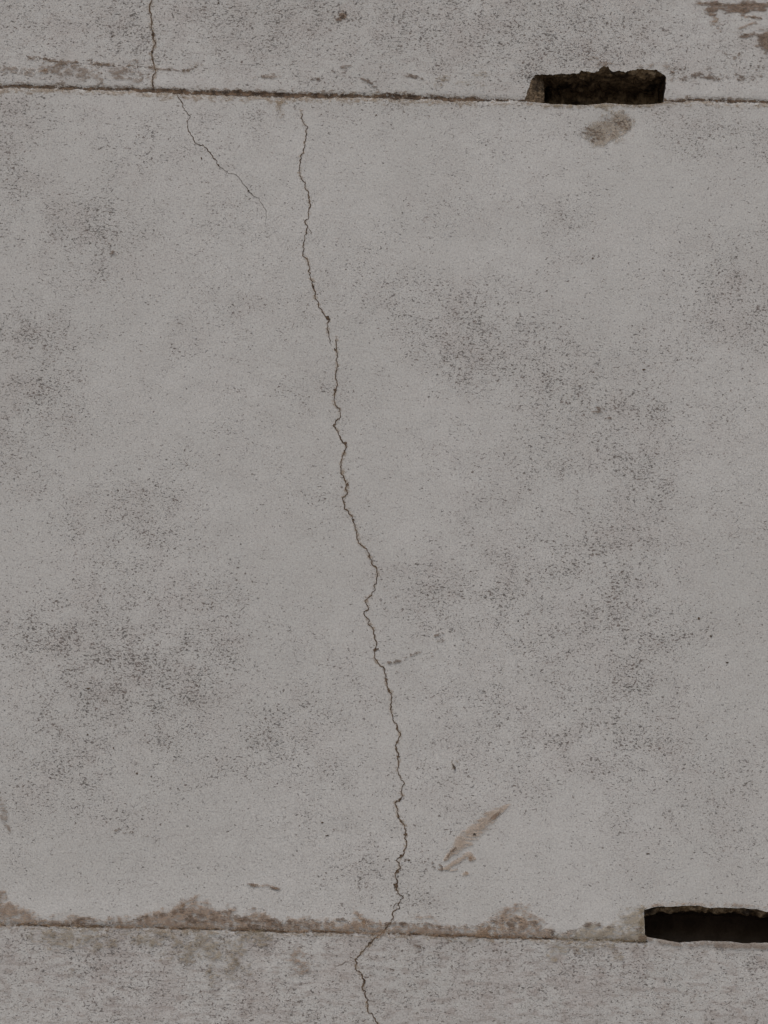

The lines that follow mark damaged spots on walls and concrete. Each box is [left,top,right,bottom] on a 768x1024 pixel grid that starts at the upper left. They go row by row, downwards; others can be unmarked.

crack [28,0,267,227]
spalling [525,57,768,147]
crack [298,114,410,1024]
spalling [644,905,768,944]